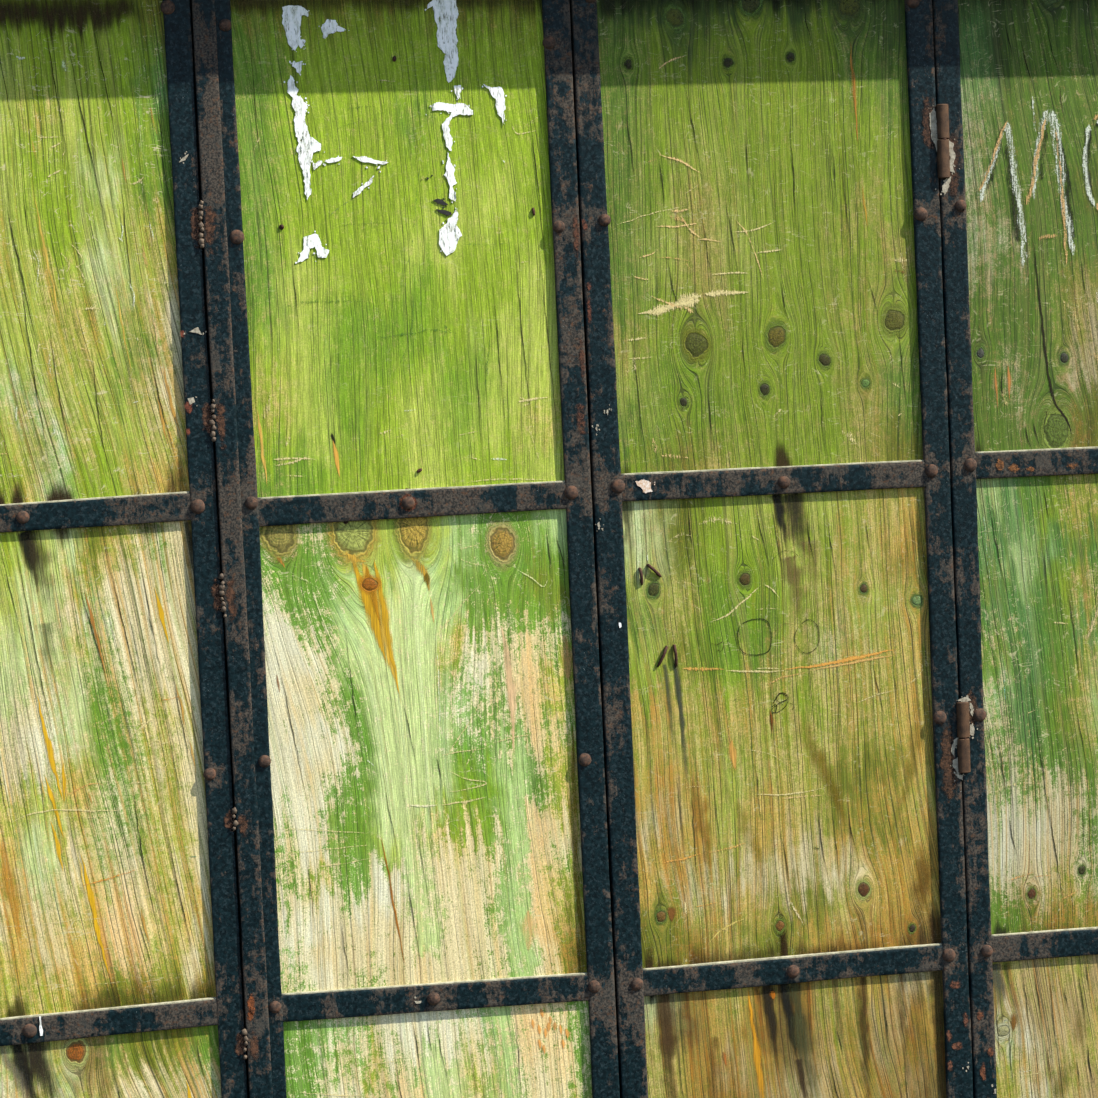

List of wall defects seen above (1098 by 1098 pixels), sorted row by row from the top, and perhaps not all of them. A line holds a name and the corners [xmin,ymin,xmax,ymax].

peeling [282,5,388,199]
peeling [425,0,473,256]
peeling [482,84,507,124]
corrosion [949,133,961,196]
peeling [295,231,329,264]
crack [1025,227,1072,446]
water stain [0,1042,54,1098]
corrosion [235,995,258,1057]
water stain [649,994,676,1098]
water stain [748,983,812,1098]
water stain [931,971,944,1067]
corrosion [946,1030,962,1071]